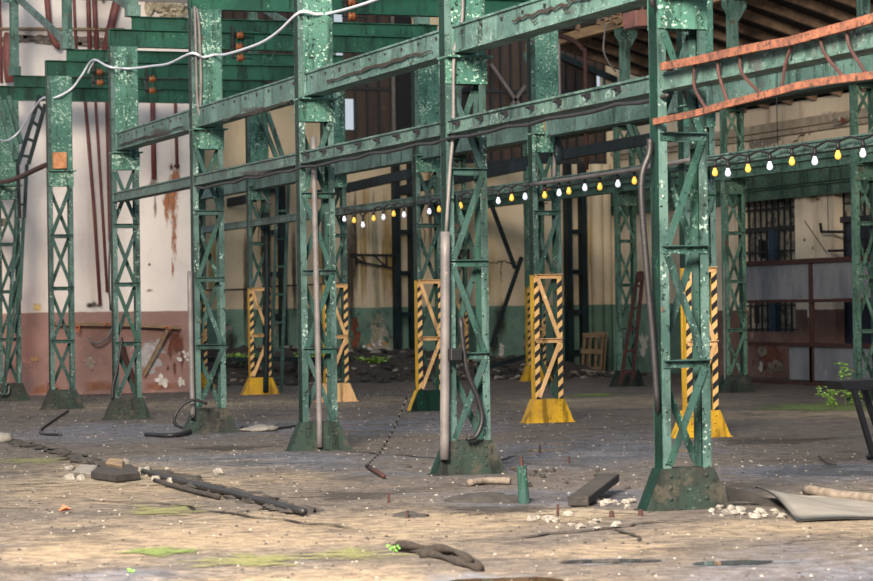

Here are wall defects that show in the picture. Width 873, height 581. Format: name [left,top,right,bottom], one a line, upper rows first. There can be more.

rust [162,192,178,276]
peeling [129,339,185,388]